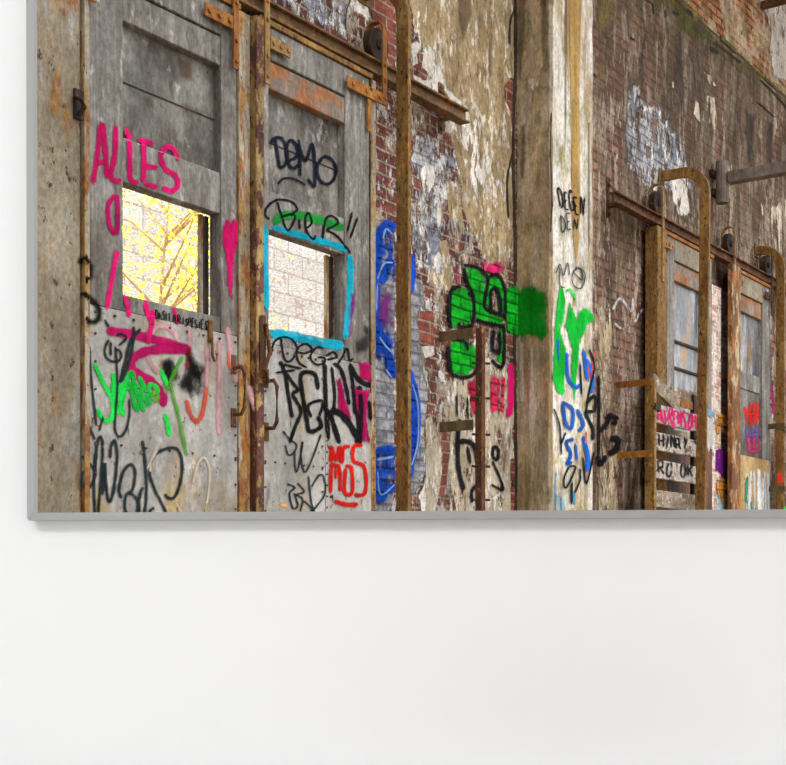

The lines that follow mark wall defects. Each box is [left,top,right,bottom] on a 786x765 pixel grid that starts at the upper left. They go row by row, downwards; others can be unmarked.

spalling [282,0,395,67]
peeling [624,85,691,216]
flaking render [694,96,717,129]
flaking render [409,0,516,511]
peeling [376,243,395,511]